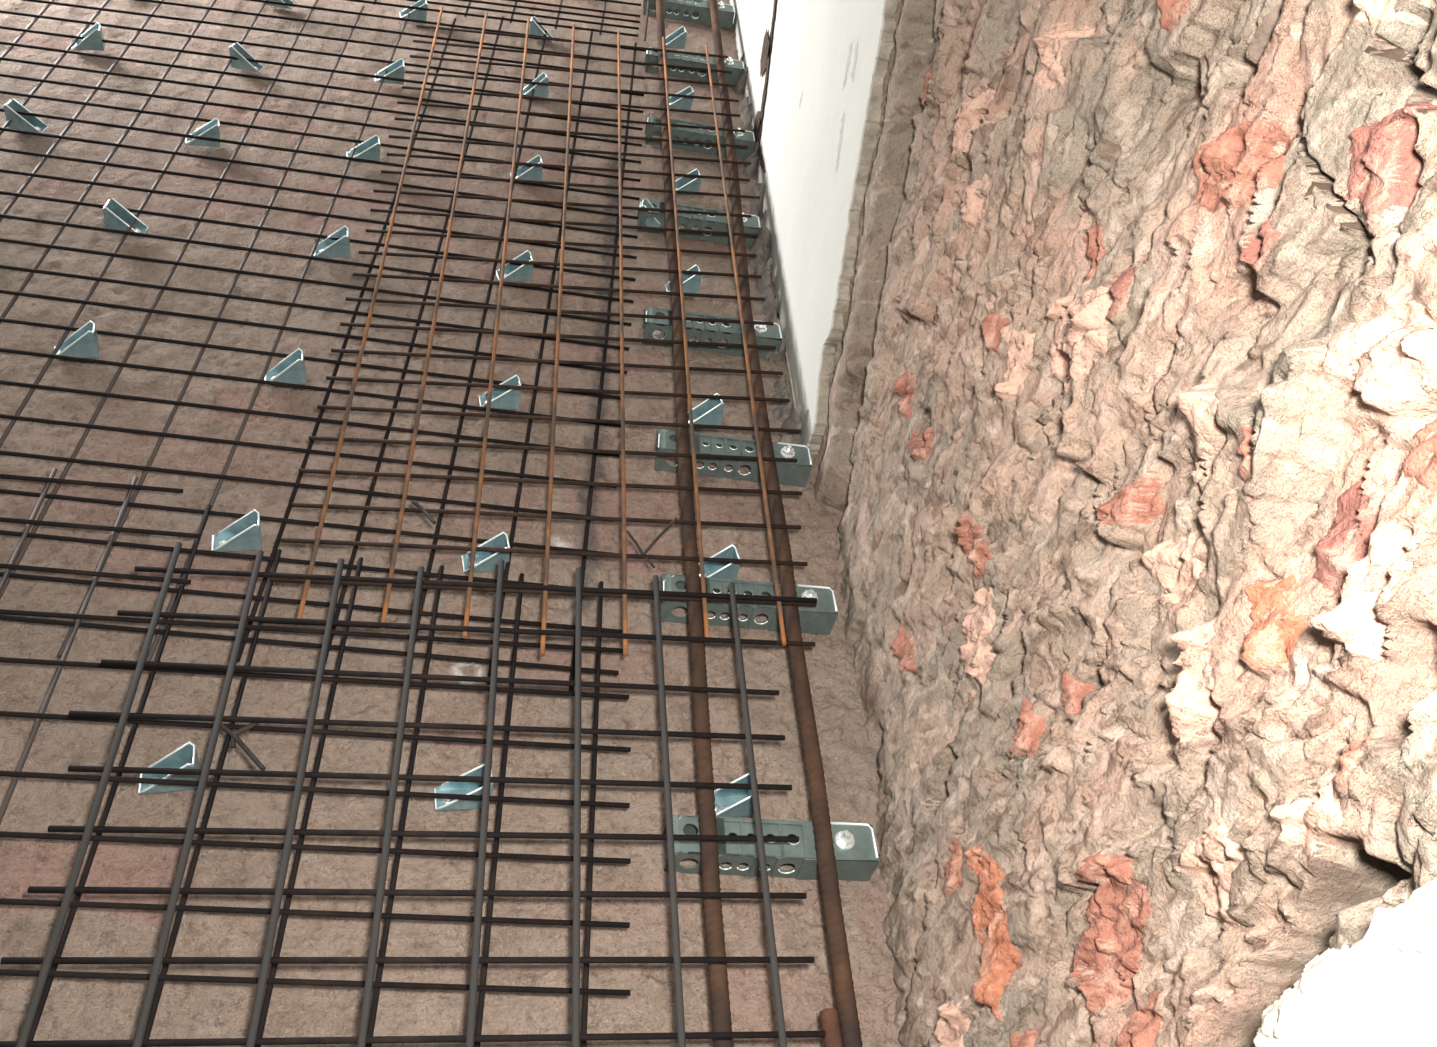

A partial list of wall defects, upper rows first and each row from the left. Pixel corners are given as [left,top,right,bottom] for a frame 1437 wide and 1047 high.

spalling [733,0,1437,1047]